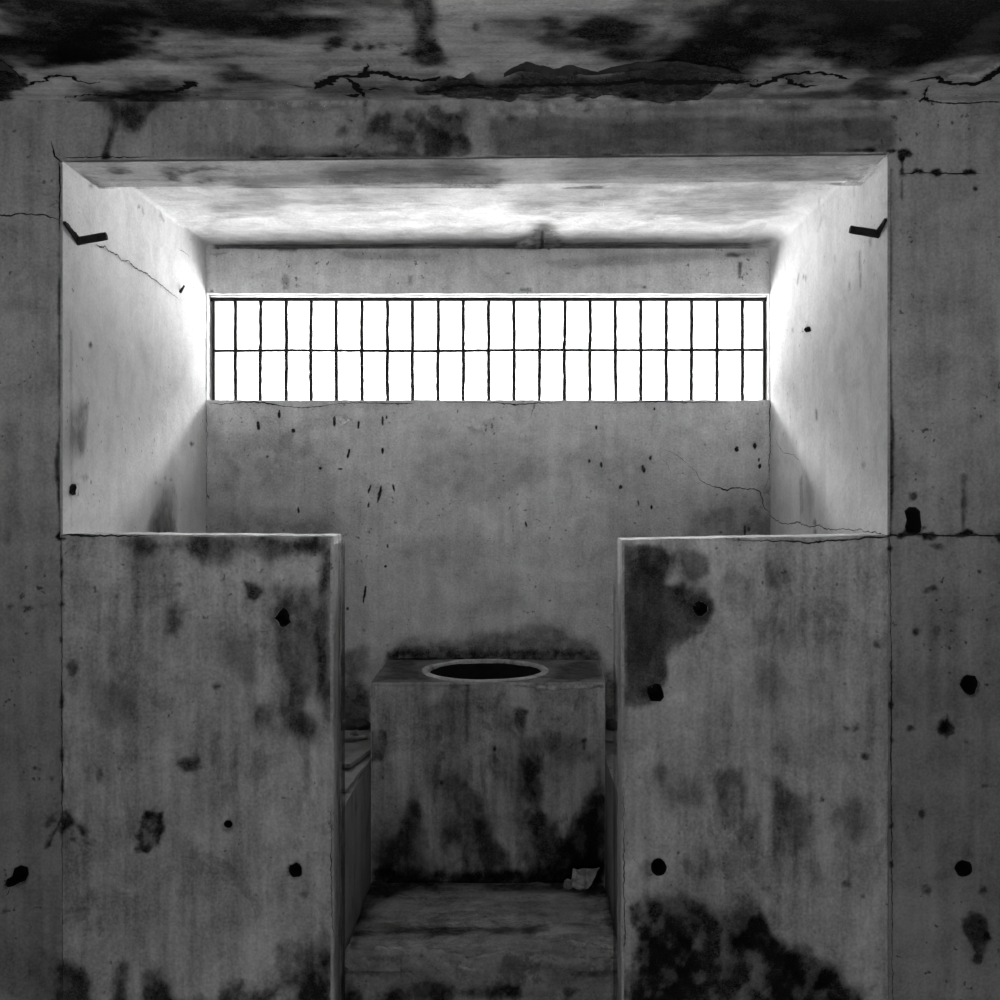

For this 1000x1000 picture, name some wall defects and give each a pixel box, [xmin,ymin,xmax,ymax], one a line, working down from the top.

crack [23,74,199,99]
water stain [0,0,445,69]
crack [288,61,441,98]
flaking render [415,60,754,104]
water stain [517,0,1000,104]
crack [747,64,848,88]
crack [908,62,1000,105]
crack [98,245,203,297]
crack [664,451,1000,998]
water stain [176,537,365,1000]
water stain [357,546,713,989]
water stain [733,918,842,1000]